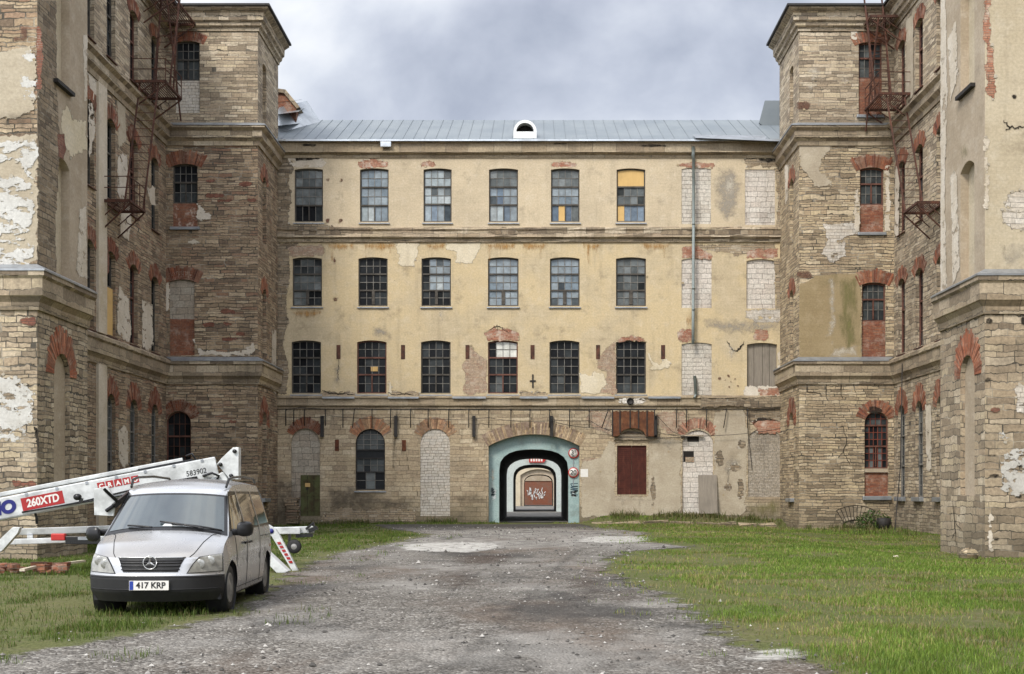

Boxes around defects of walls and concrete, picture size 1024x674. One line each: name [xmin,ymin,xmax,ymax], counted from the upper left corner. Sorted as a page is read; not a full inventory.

flaking render [0,0,97,279]
flaking render [196,179,232,221]
spalling [982,135,1024,231]
flaking render [396,242,420,267]
flaking render [445,242,481,264]
spalling [462,345,488,396]
flaking render [579,334,781,518]